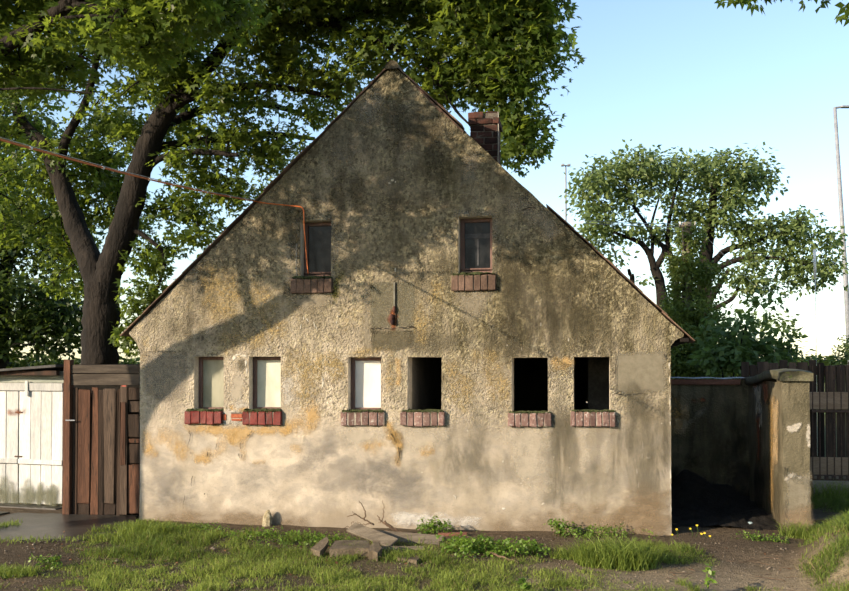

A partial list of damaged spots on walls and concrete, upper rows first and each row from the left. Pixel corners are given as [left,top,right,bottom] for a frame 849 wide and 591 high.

spalling [787,423,810,446]
leakage [560,455,668,536]